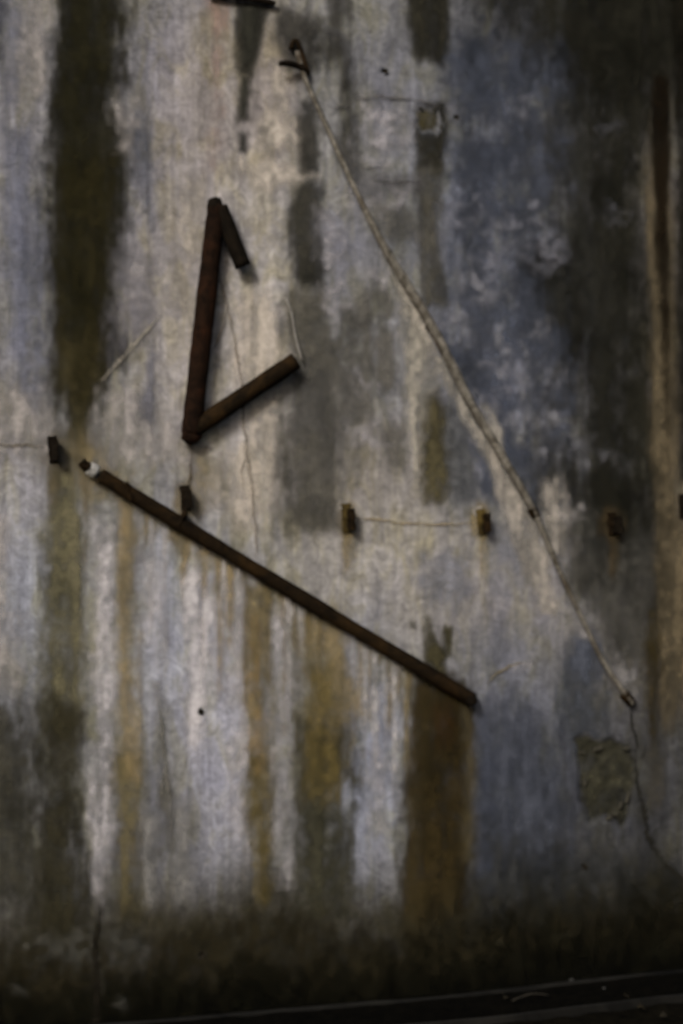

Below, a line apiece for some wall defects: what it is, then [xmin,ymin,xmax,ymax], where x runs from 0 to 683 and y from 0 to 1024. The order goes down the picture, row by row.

leakage [0,390,48,452]
leakage [13,0,168,461]
rust [116,737,140,912]
rust [119,500,148,620]
leakage [185,574,213,738]
rust [169,527,360,923]
leakage [274,599,292,670]
leakage [0,702,683,1024]
rust [388,662,473,968]
leakage [228,0,677,657]